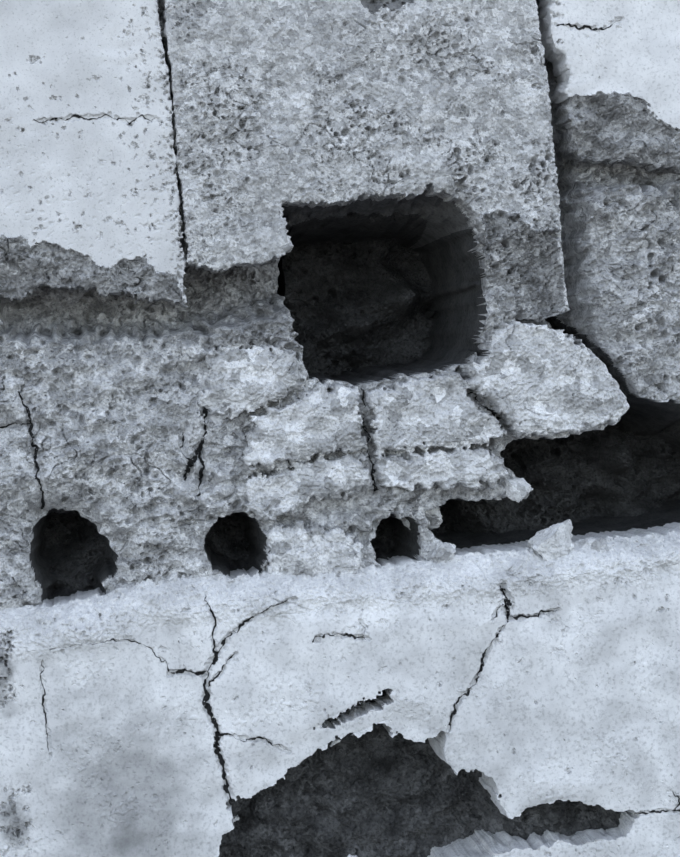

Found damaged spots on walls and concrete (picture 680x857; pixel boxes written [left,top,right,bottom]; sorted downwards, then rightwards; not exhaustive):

crack [557,20,620,31]
spalling [555,91,680,180]
spalling [0,235,301,355]
spalling [473,210,565,323]
crack [545,316,630,396]
crack [0,391,45,510]
crack [180,407,208,515]
spalling [429,393,680,549]
crack [40,594,294,802]
spalling [327,690,386,722]
crack [448,586,557,733]
spalling [218,723,622,857]